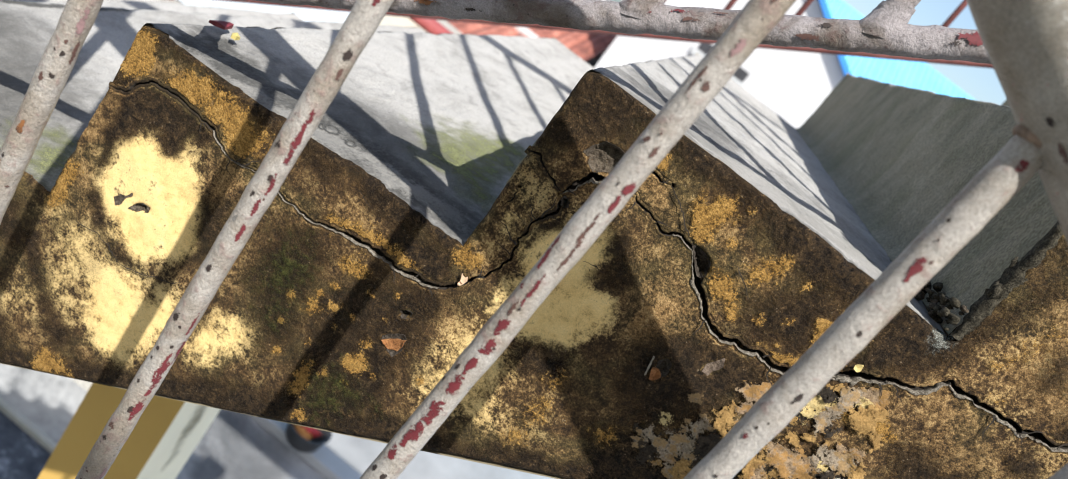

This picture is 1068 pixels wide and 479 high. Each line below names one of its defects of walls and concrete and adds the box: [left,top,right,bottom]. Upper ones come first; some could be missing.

leakage [0,197,141,389]
leakage [88,62,211,266]
crack [109,78,259,178]
leakage [143,25,287,139]
crack [277,145,612,295]
crack [626,169,792,384]
leakage [670,135,875,353]
spalling [903,221,1064,341]
leakage [423,326,774,479]
peeling [630,376,777,479]
peeling [732,383,891,479]
crack [829,367,1068,454]